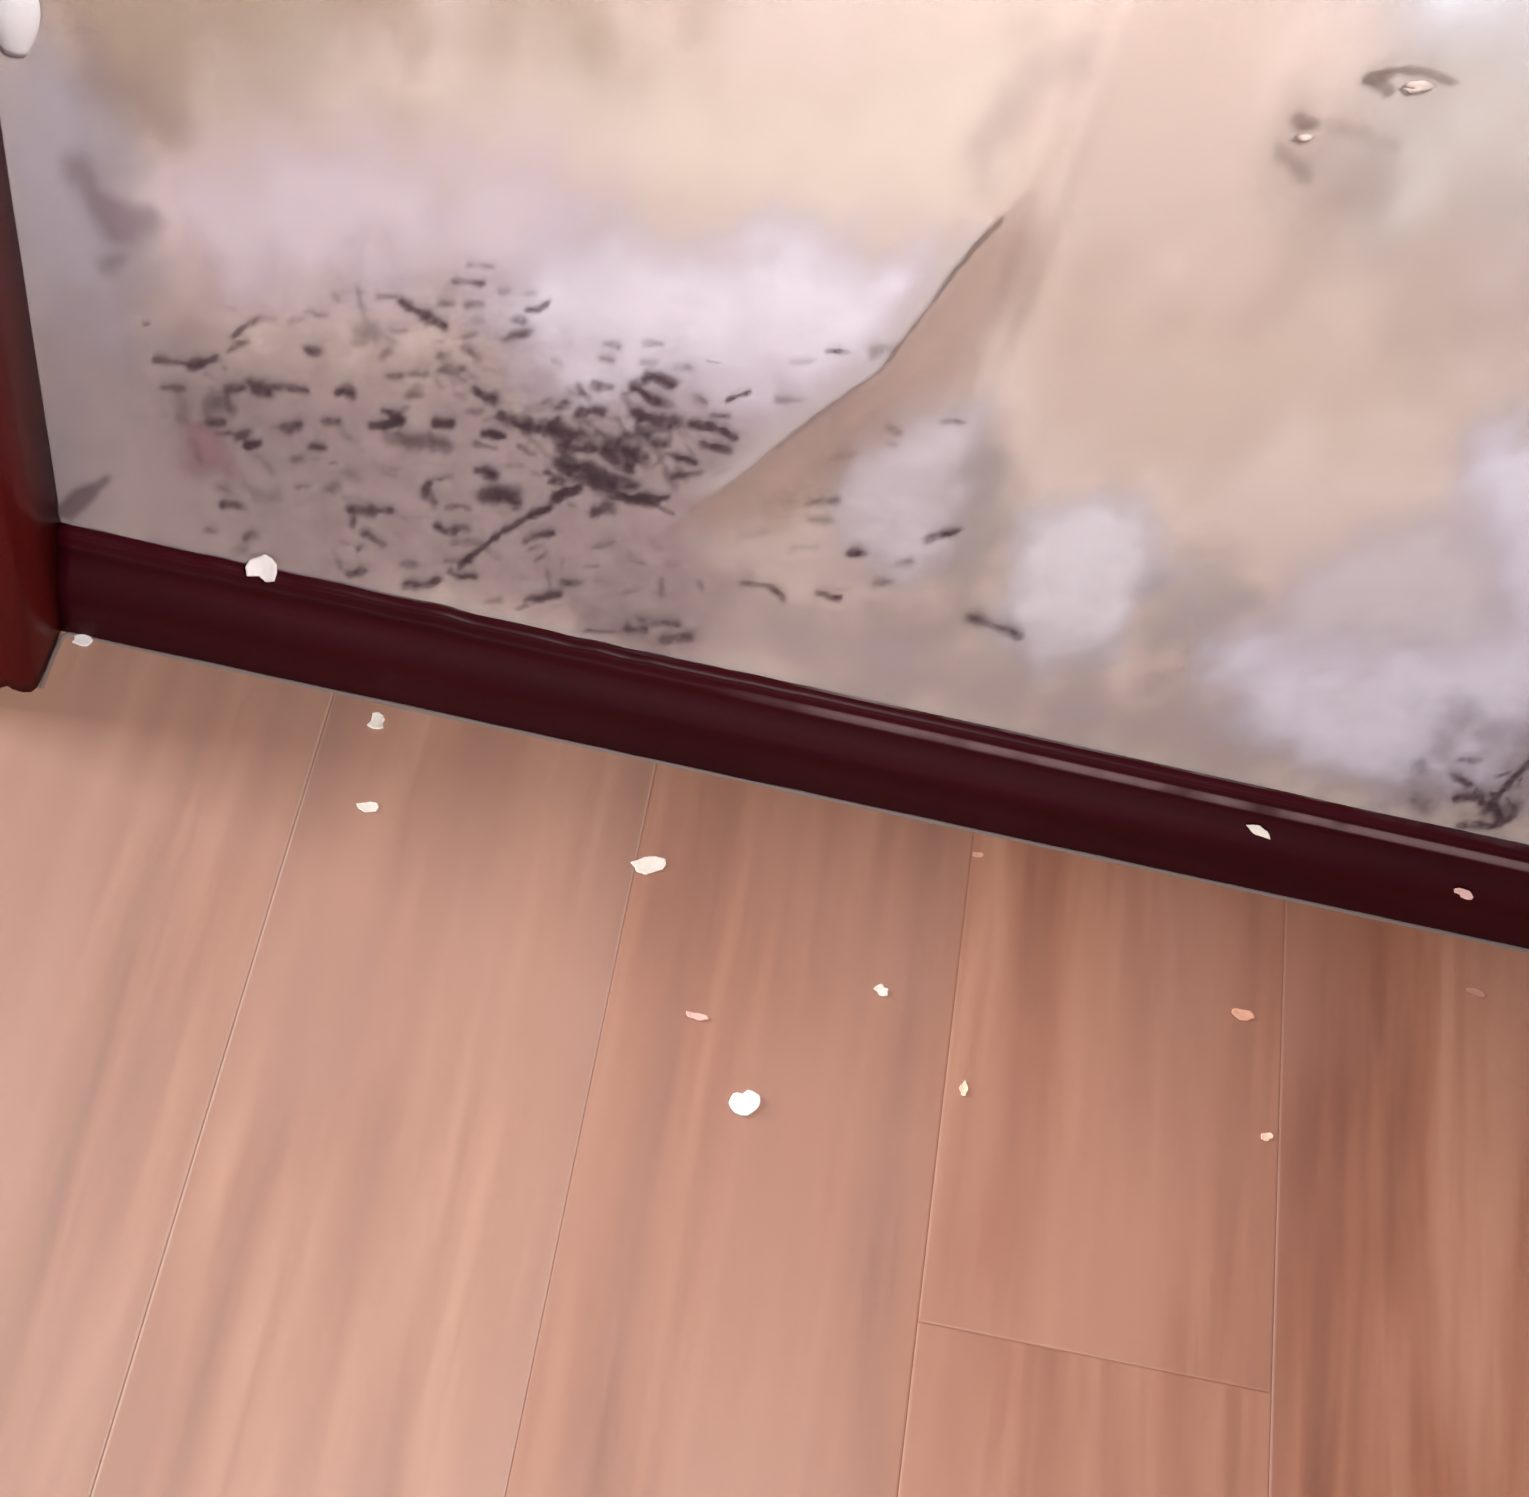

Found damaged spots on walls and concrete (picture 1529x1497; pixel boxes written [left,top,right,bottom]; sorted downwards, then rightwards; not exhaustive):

water stain [4,57,750,643]
water stain [1452,759,1529,829]